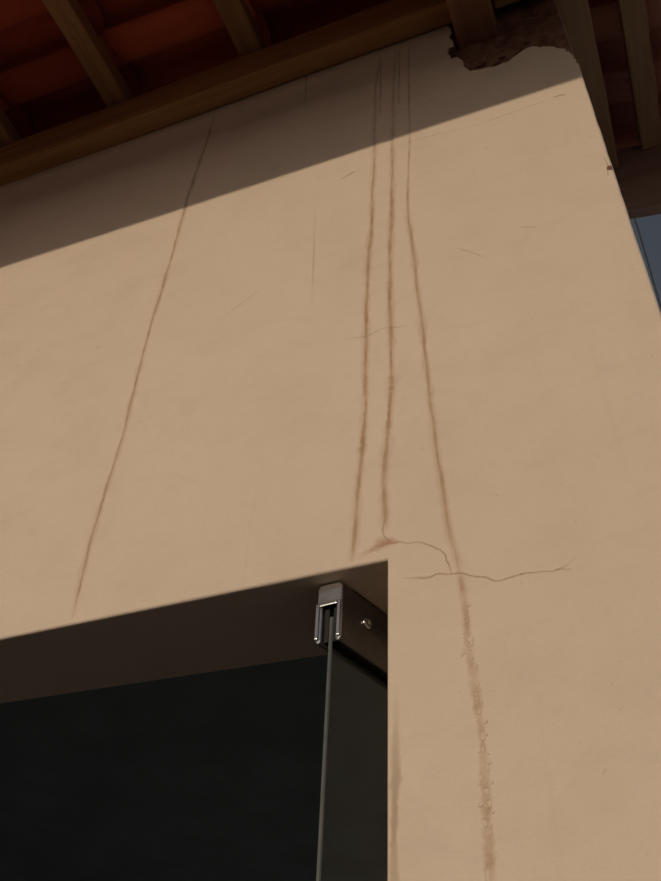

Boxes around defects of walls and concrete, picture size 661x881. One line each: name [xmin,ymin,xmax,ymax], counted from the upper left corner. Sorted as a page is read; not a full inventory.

spalling [450,0,573,71]